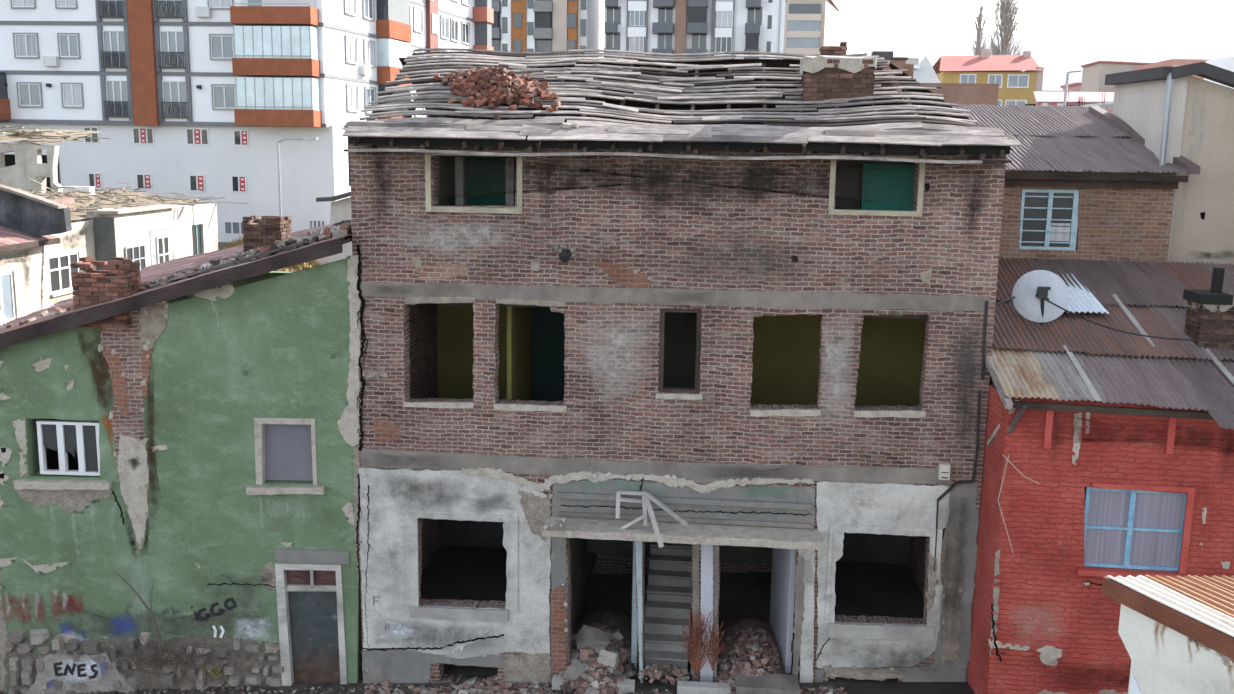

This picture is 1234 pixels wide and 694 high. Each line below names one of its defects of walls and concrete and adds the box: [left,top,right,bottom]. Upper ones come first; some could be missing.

spalling [0,302,169,554]
flaking render [337,255,366,572]
crack [356,244,504,651]
spalling [461,467,814,542]
flaking render [0,558,71,694]
flaking render [60,631,113,647]
peeling [988,549,1064,670]
water stain [1067,669,1130,685]